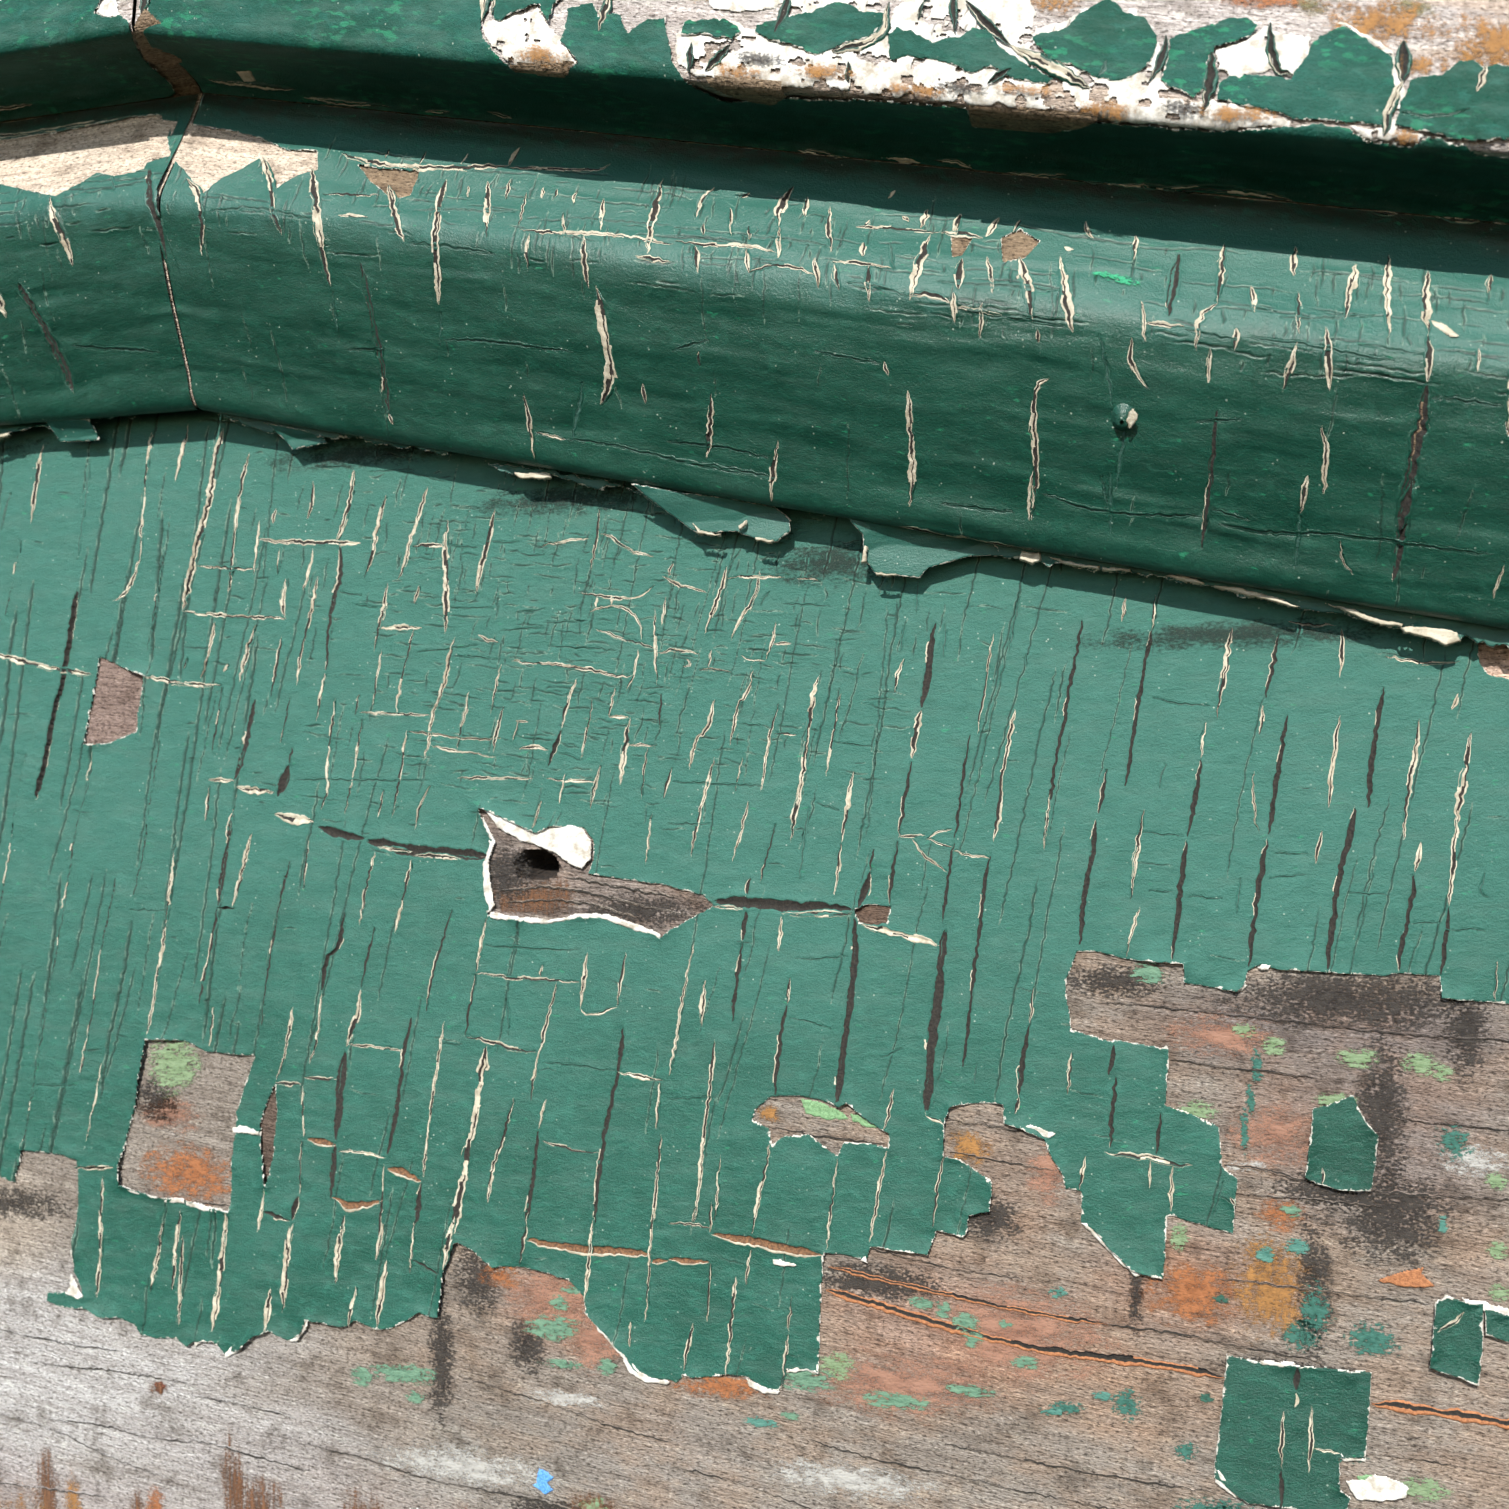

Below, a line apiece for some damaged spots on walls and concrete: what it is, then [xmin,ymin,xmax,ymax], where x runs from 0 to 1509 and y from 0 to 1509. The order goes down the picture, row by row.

peeling [208,71,392,108]
peeling [0,115,318,196]
crack [49,197,74,266]
crack [0,282,160,392]
crack [110,147,1509,599]
peeling [83,658,143,745]
crack [1043,617,1084,848]
crack [1077,596,1498,1001]
peeling [478,808,713,938]
crack [1013,987,1035,1114]
crack [1066,1045,1192,1211]
peeling [0,952,1509,1509]